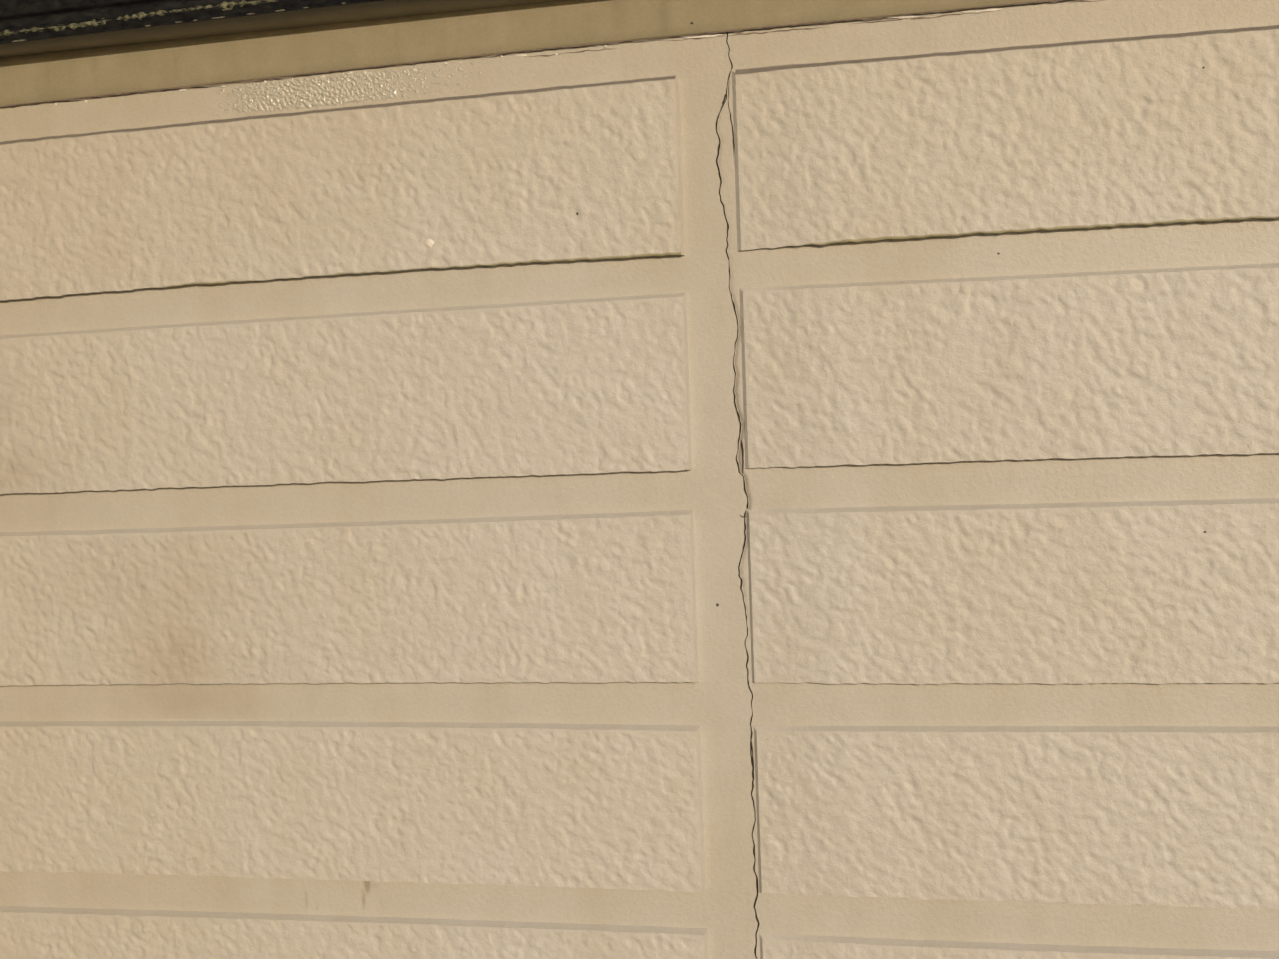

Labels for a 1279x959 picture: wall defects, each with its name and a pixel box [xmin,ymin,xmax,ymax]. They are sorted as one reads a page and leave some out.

crack [0,58,451,107]
crack [463,0,1103,959]